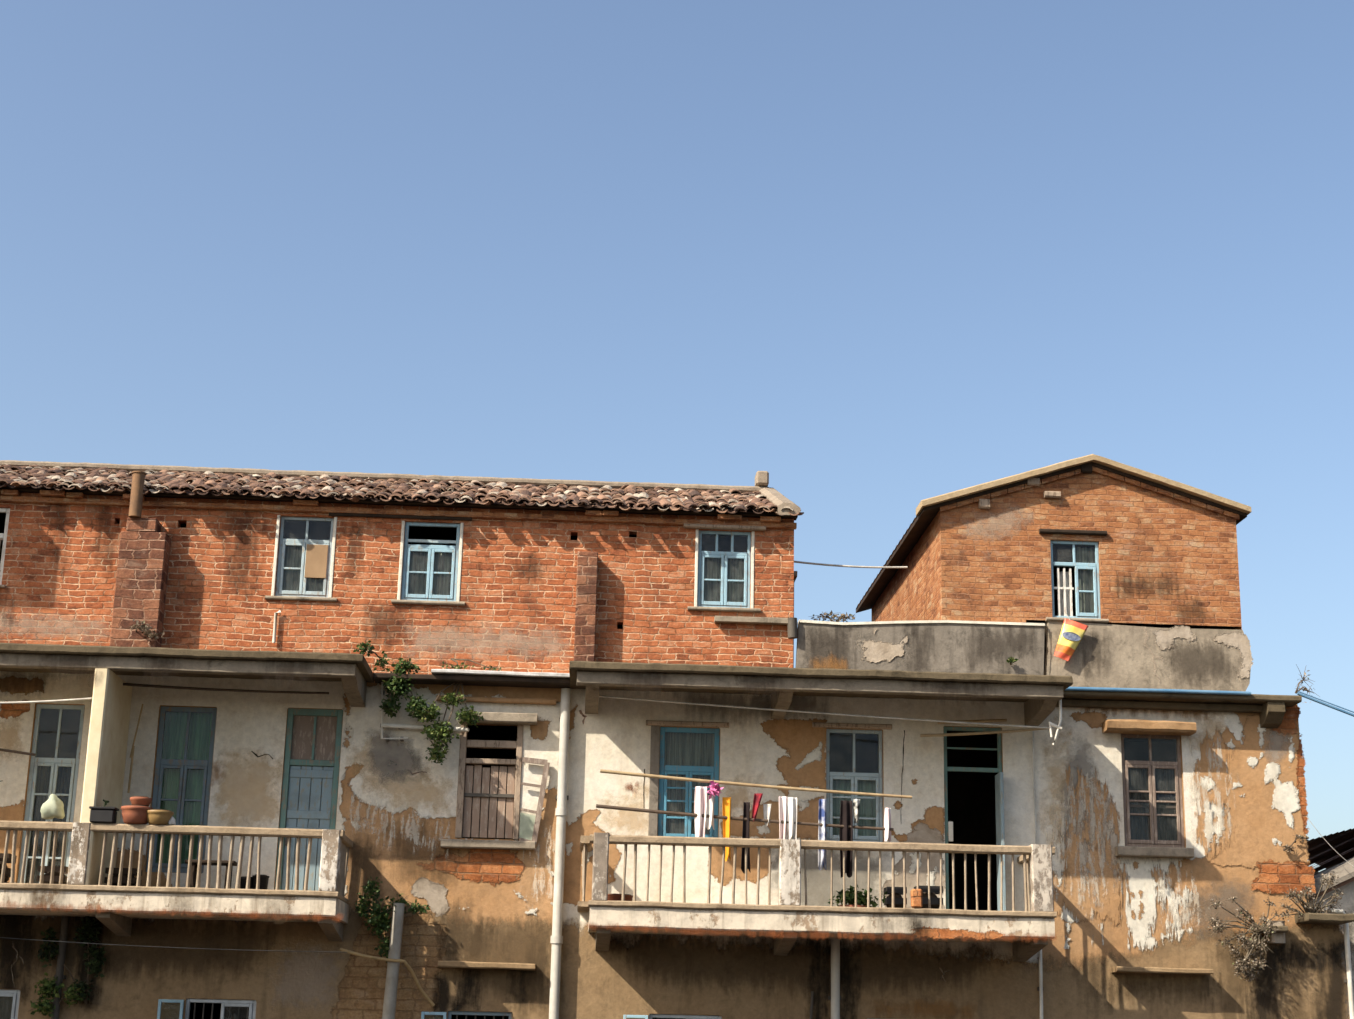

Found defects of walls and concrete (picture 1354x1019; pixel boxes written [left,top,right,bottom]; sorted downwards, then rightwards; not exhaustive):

spalling [856,628,908,663]
peeling [1071,710,1107,728]
peeling [339,763,376,834]
peeling [708,718,827,886]
peeling [1192,702,1316,894]
spalling [882,806,946,909]
peeling [1053,766,1195,952]
spalling [330,809,622,1019]
spalling [911,926,1005,940]